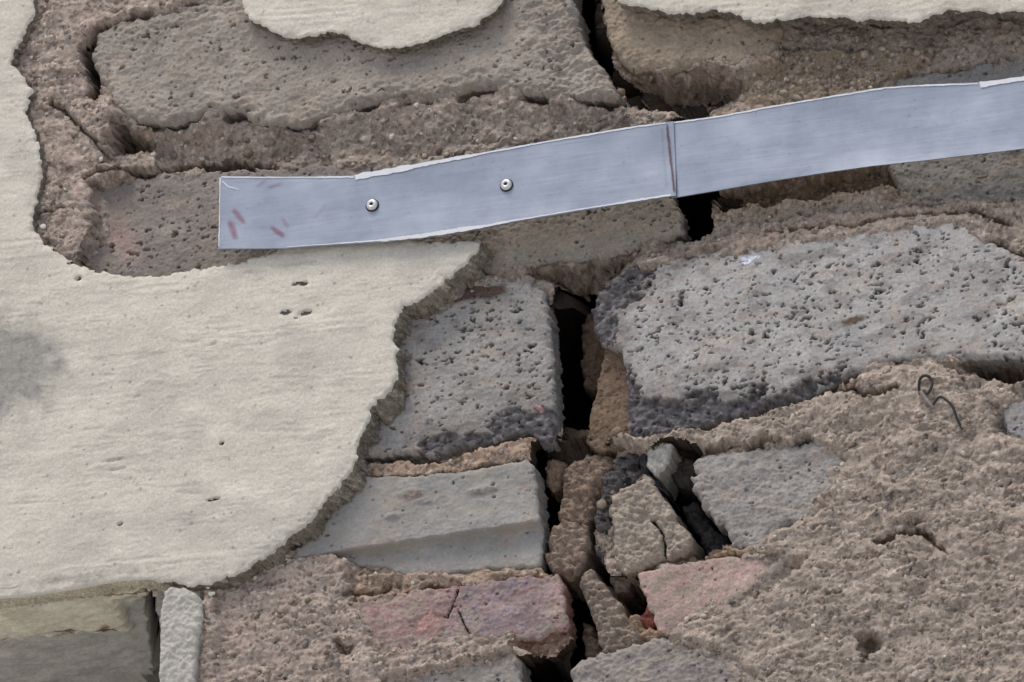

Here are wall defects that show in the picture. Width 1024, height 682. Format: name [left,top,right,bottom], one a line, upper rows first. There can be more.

spalling [246,0,506,53]
crack [582,0,725,122]
spalling [619,2,1024,31]
spalling [11,0,122,281]
crack [677,191,743,242]
spalling [586,266,847,459]
spalling [0,242,493,610]
spalling [419,407,559,458]
crack [529,277,615,576]
crack [649,436,703,460]
crack [594,535,648,616]
crack [515,597,598,682]